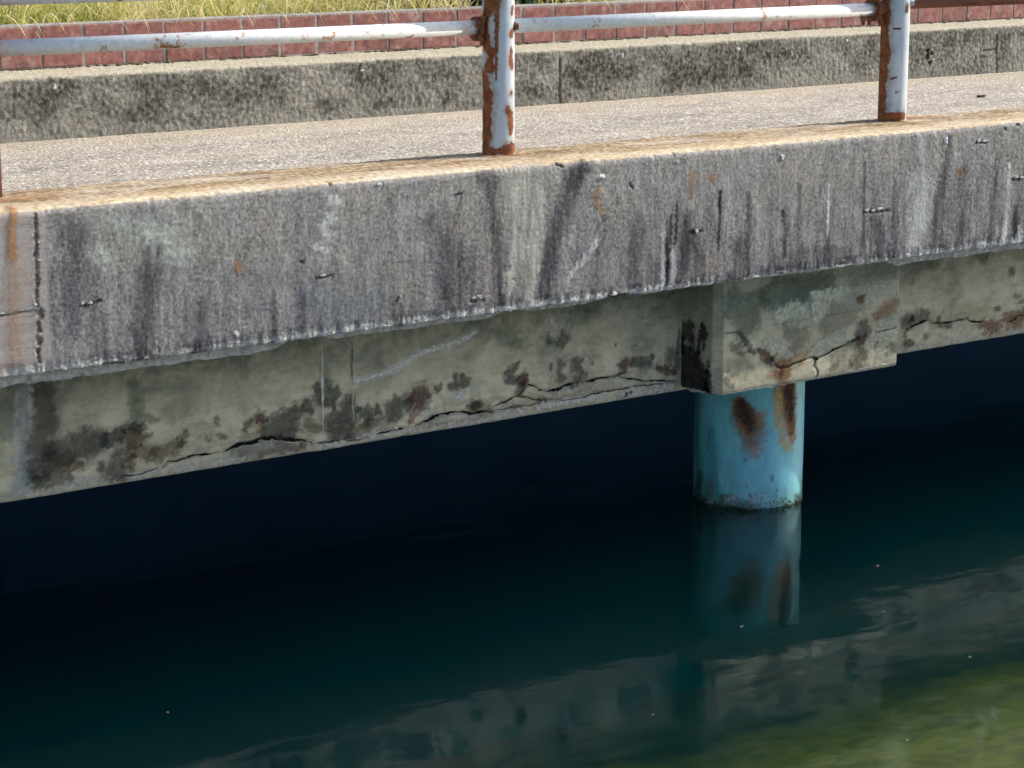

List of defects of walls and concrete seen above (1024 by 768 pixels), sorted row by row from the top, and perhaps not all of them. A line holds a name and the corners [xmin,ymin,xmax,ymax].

rust [482,0,515,157]
rust [877,0,943,122]
rust [0,198,22,261]
leakage [264,164,713,343]
leakage [733,169,1024,282]
leakage [176,453,257,473]
leakage [312,400,421,451]
crack [116,370,673,481]
leakage [429,391,604,431]
leakage [618,323,709,398]
rust [733,345,815,461]
crack [770,318,984,375]